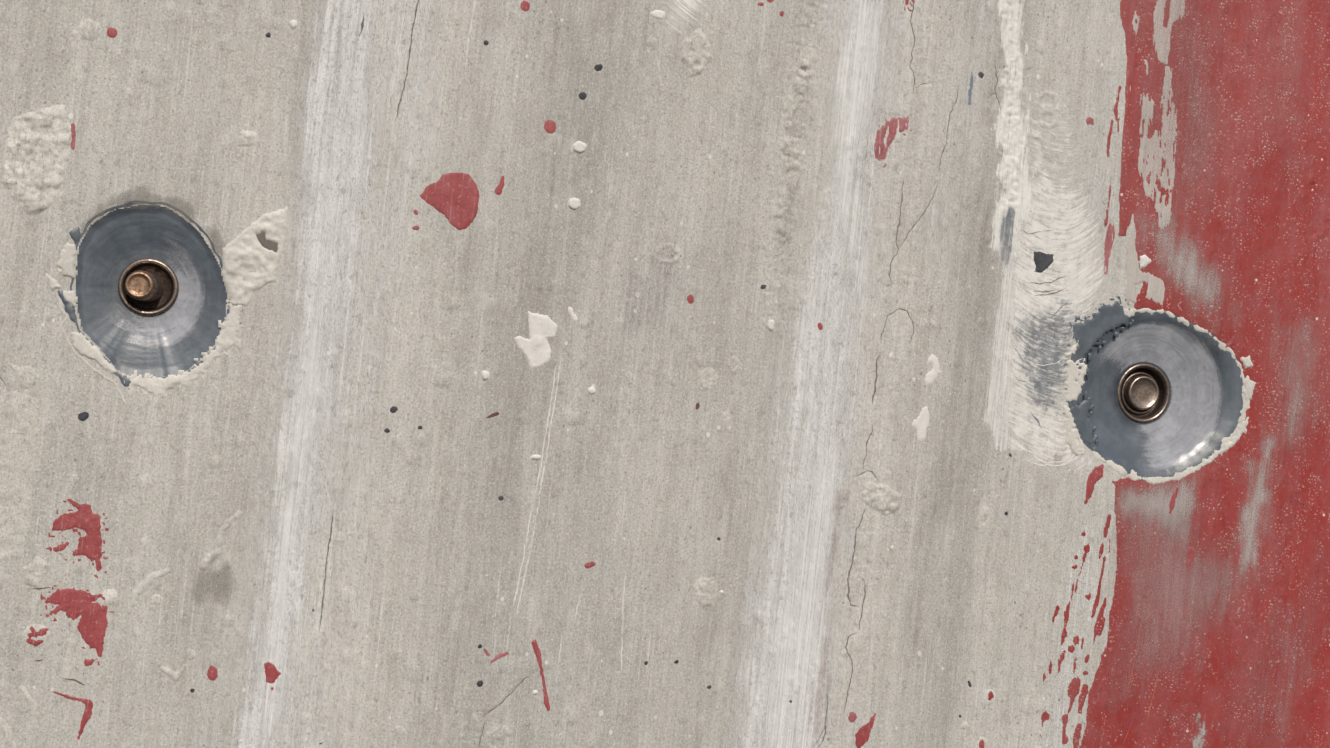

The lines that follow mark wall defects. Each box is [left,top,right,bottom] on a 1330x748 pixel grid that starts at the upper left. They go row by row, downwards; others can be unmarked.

peeling [1130,0,1185,229]
spalling [1062,223,1256,485]